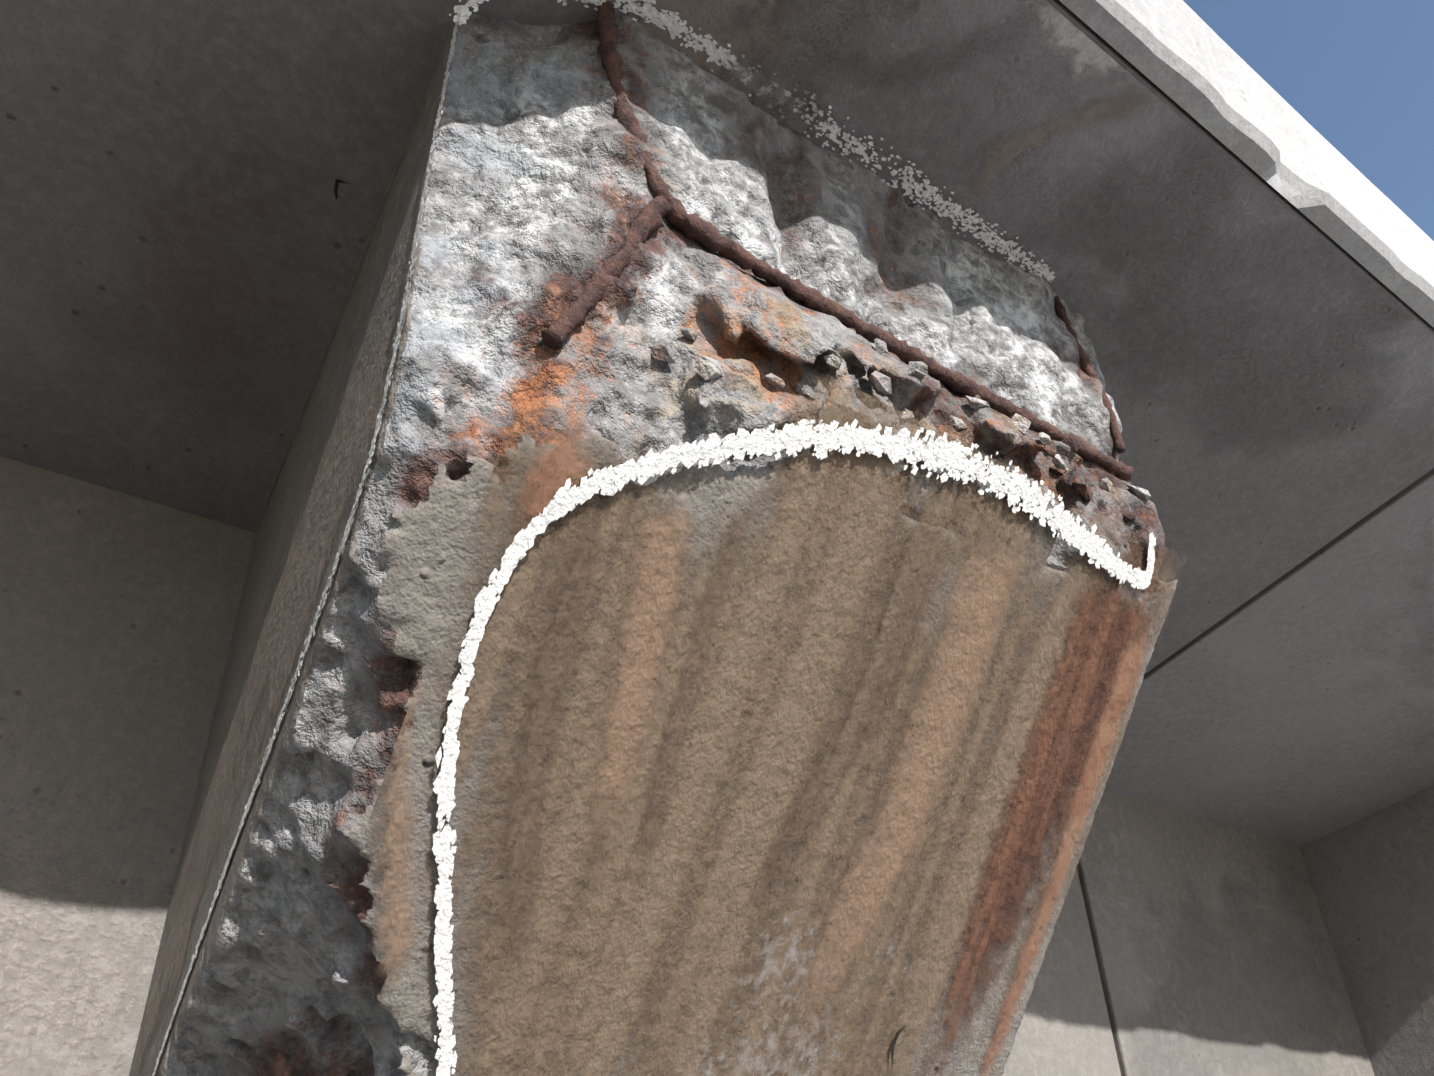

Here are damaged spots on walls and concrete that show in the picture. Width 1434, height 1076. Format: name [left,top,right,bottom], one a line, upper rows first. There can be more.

rust [375,697,413,963]
spalling [165,1,1171,1076]
rust [454,385,1173,1076]